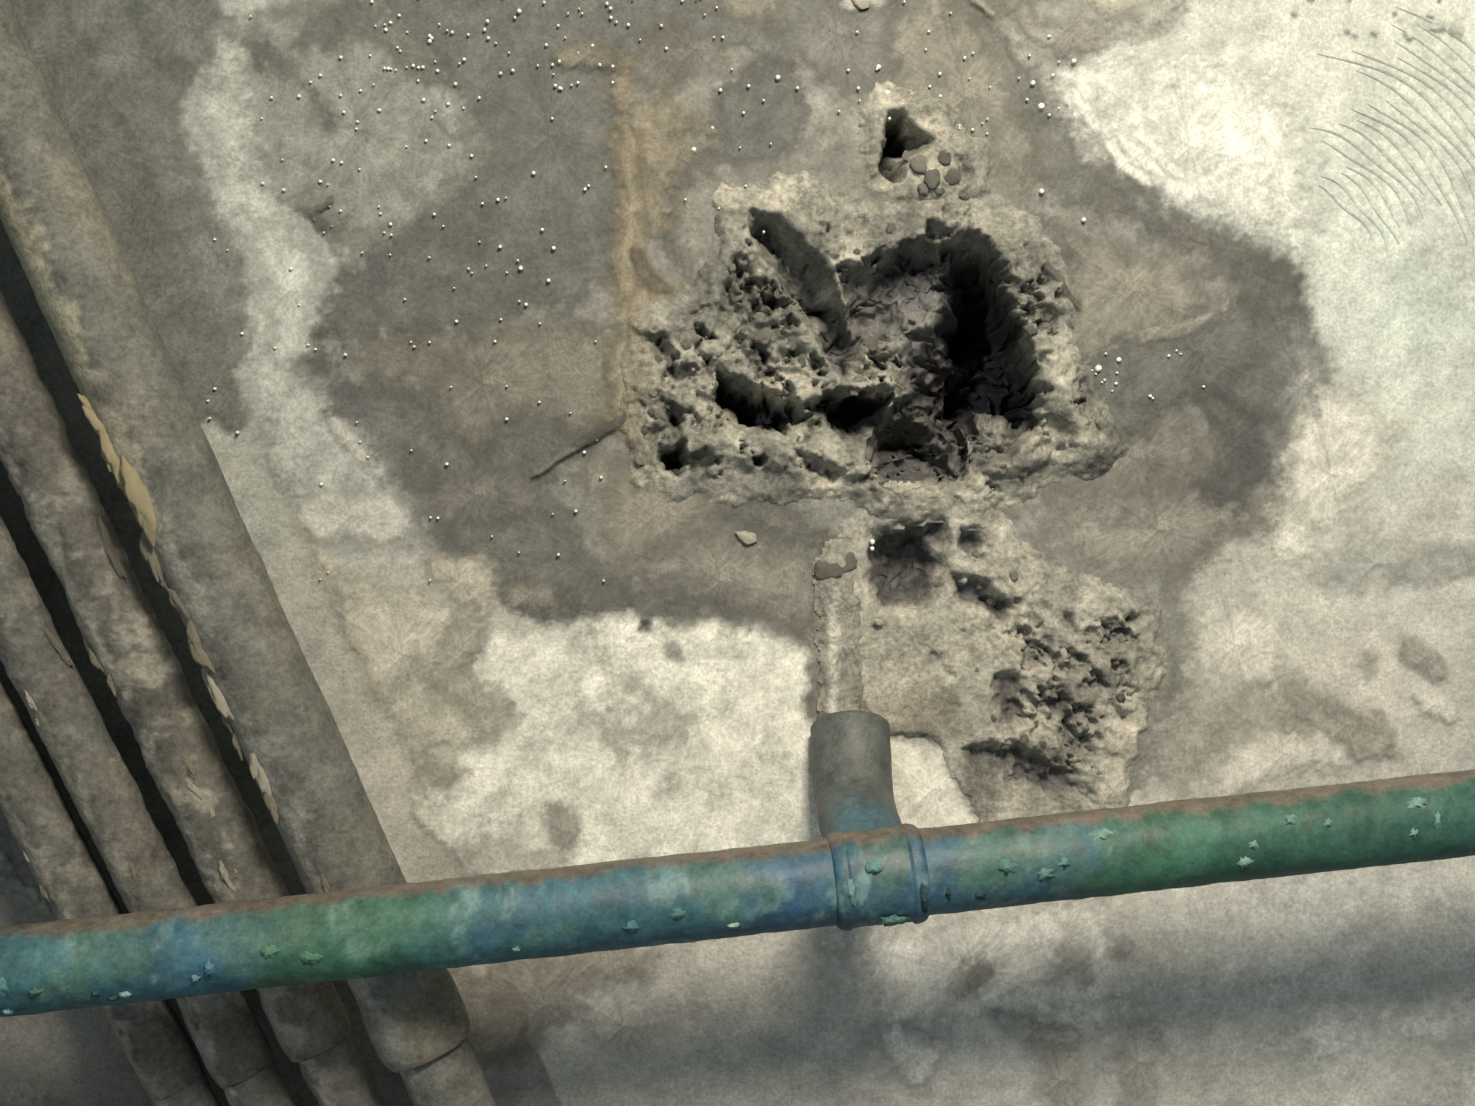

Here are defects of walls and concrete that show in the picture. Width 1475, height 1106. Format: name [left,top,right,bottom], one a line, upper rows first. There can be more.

leakage [10,0,1397,824]
spalling [614,170,1168,828]
peeling [1088,828,1115,842]
leakage [1400,636,1459,722]